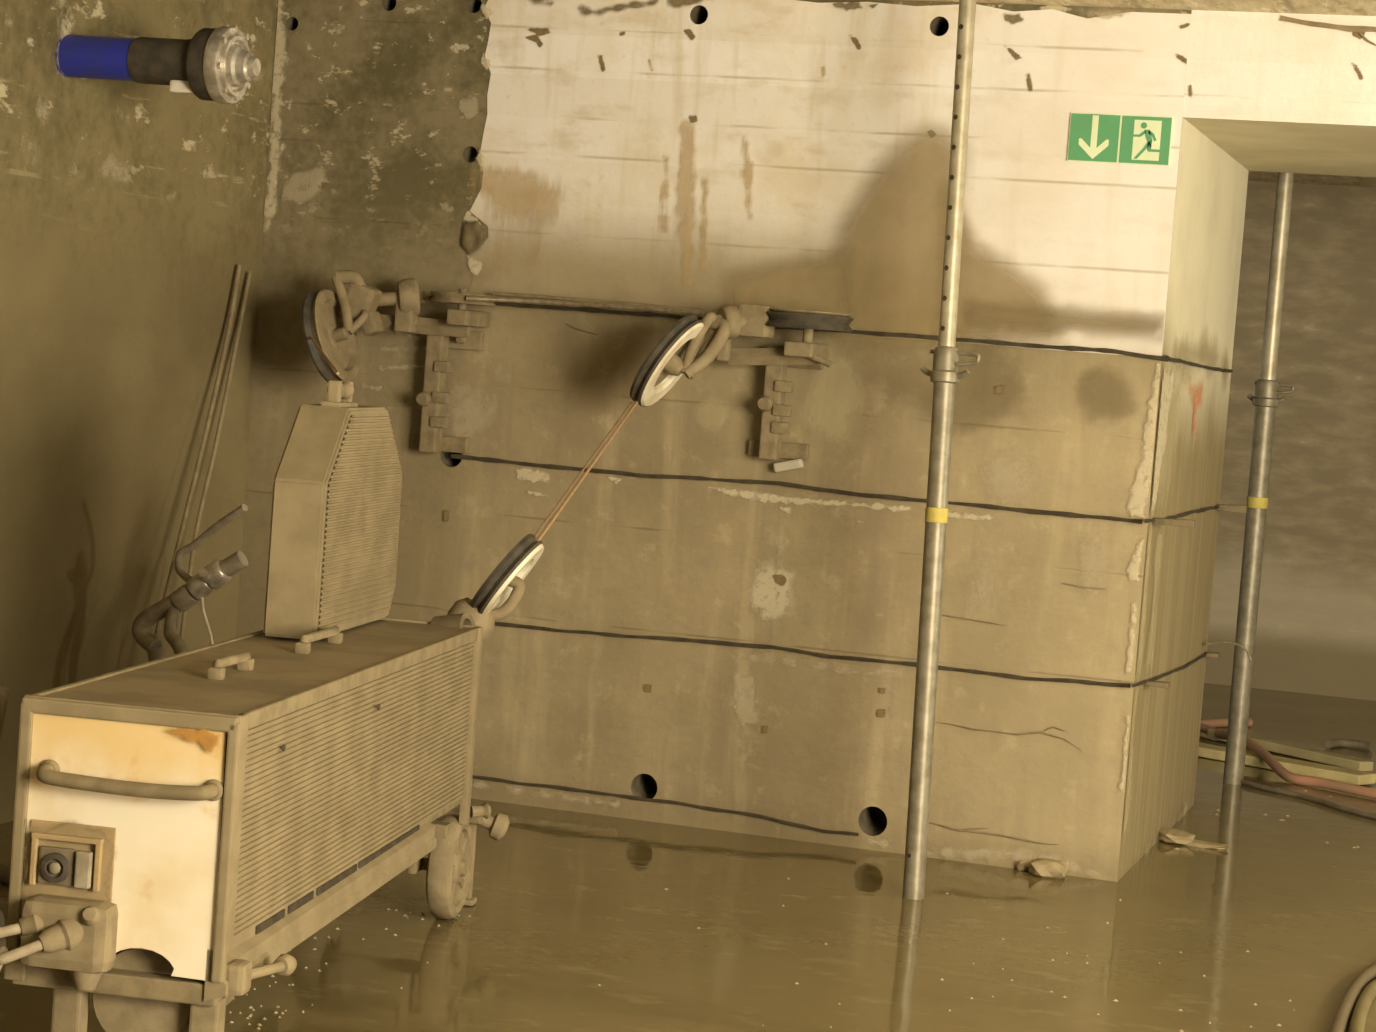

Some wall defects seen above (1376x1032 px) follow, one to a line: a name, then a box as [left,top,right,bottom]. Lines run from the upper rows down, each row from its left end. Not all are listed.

spalling [60,0,73,39]
peeling [468,257,482,275]
spalling [1127,363,1174,517]
spalling [772,575,786,586]
spalling [1127,542,1143,581]
spalling [1126,604,1137,673]
crack [935,722,1081,750]
spalling [1119,716,1130,789]
crack [929,822,1060,845]